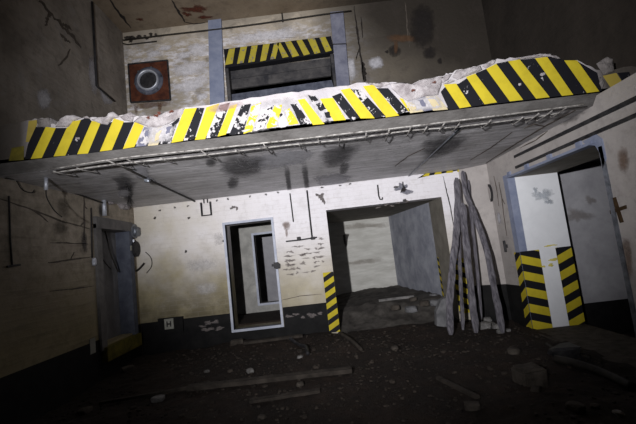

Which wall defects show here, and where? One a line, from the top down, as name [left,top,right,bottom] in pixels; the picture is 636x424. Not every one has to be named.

rust [182,5,213,19]
crack [39,0,81,66]
crack [354,6,364,82]
peeling [174,44,207,100]
flaking render [367,60,496,110]
flaking render [596,57,614,89]
peeling [307,96,331,119]
damp [225,159,258,188]
spalling [37,101,585,176]
damp [317,147,352,186]
damp [427,140,460,155]
peeling [284,238,324,275]